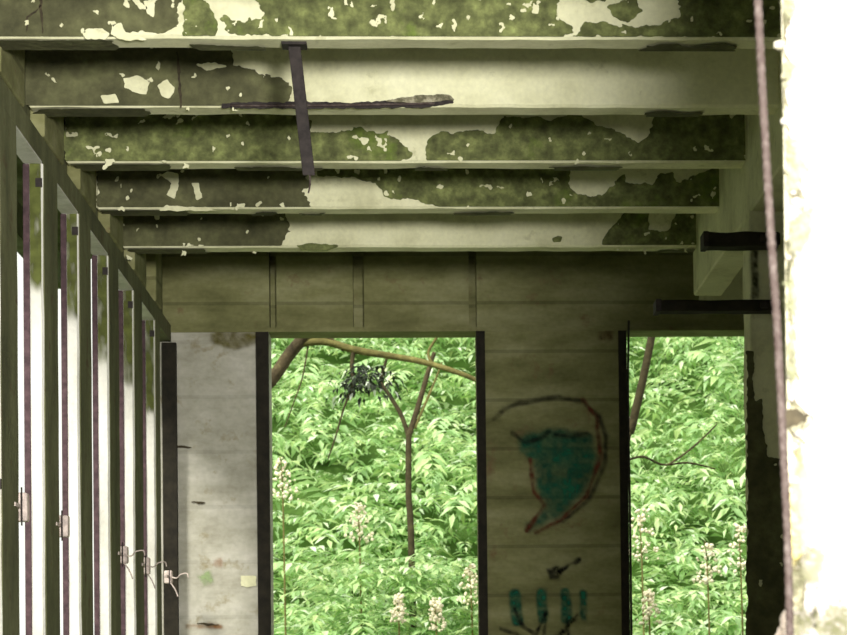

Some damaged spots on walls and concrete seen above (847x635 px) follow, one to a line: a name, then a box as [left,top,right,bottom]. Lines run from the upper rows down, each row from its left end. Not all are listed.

flaking render [0,0,311,256]
flaking render [220,0,810,635]
leakage [790,453,825,589]
leakage [794,599,847,635]